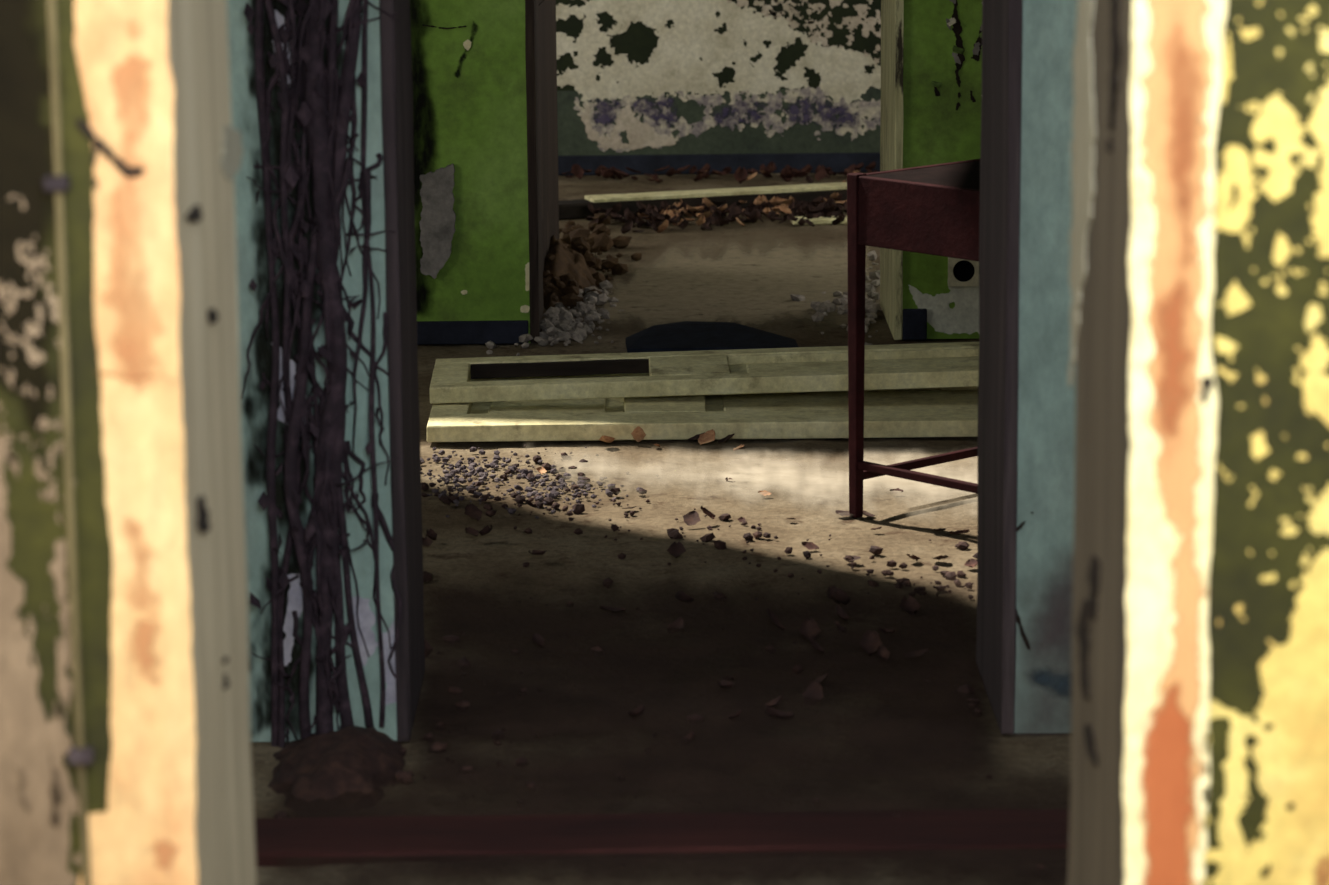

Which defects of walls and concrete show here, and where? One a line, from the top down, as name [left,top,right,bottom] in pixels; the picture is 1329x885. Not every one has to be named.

flaking render [0,0,198,885]
flaking render [556,0,881,153]
flaking render [909,285,979,335]
flaking render [1122,0,1329,885]